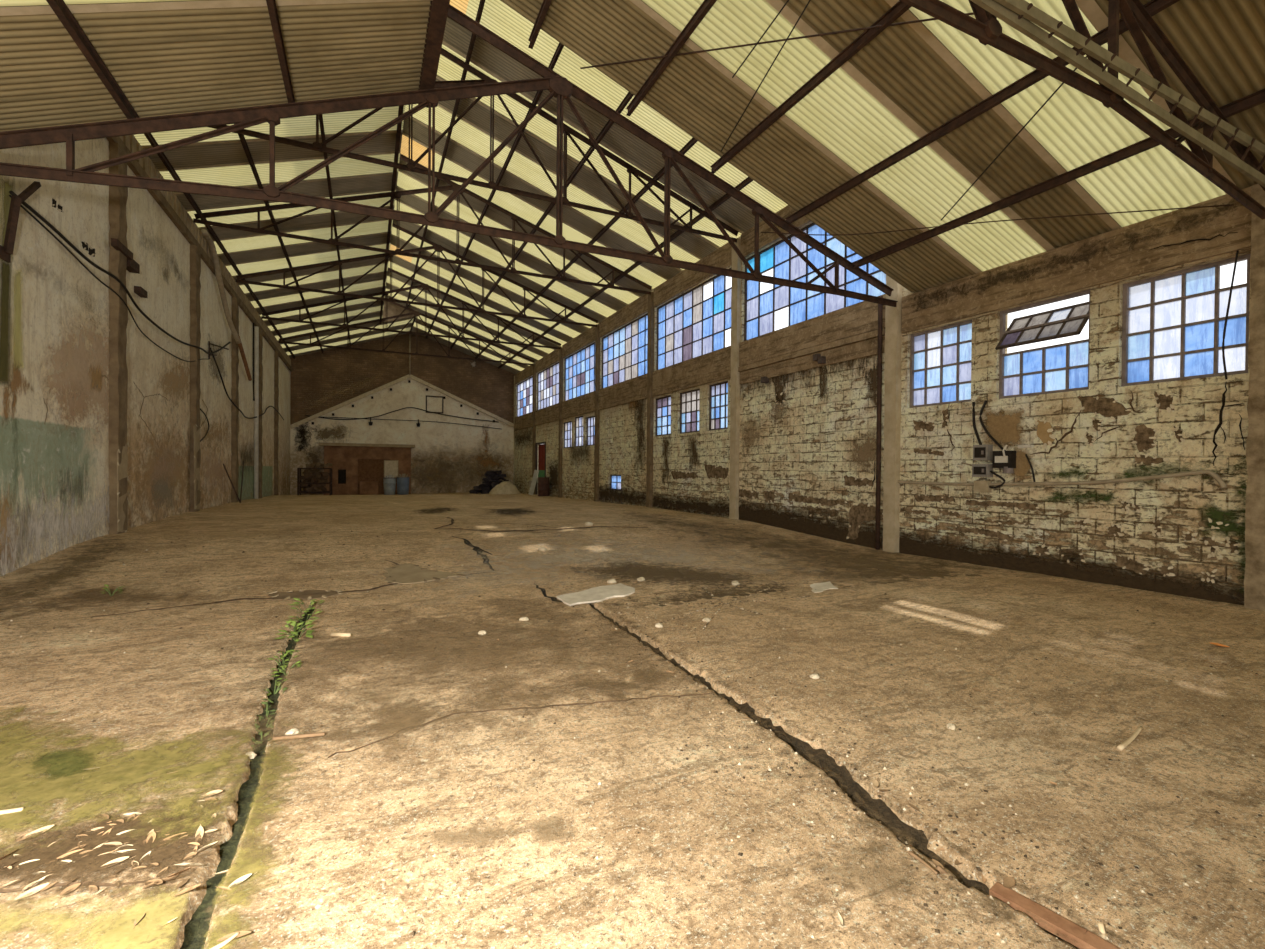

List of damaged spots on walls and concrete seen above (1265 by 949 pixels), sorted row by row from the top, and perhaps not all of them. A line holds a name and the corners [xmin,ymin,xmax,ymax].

water stain [741,355,877,452]
peeling [984,411,1055,477]
peeling [1077,391,1185,465]
crack [1212,381,1245,465]
crack [92,594,306,617]
crack [344,560,398,592]
crack [435,517,648,575]
crack [536,585,562,602]
peeling [739,475,883,540]
water stain [599,432,1247,605]